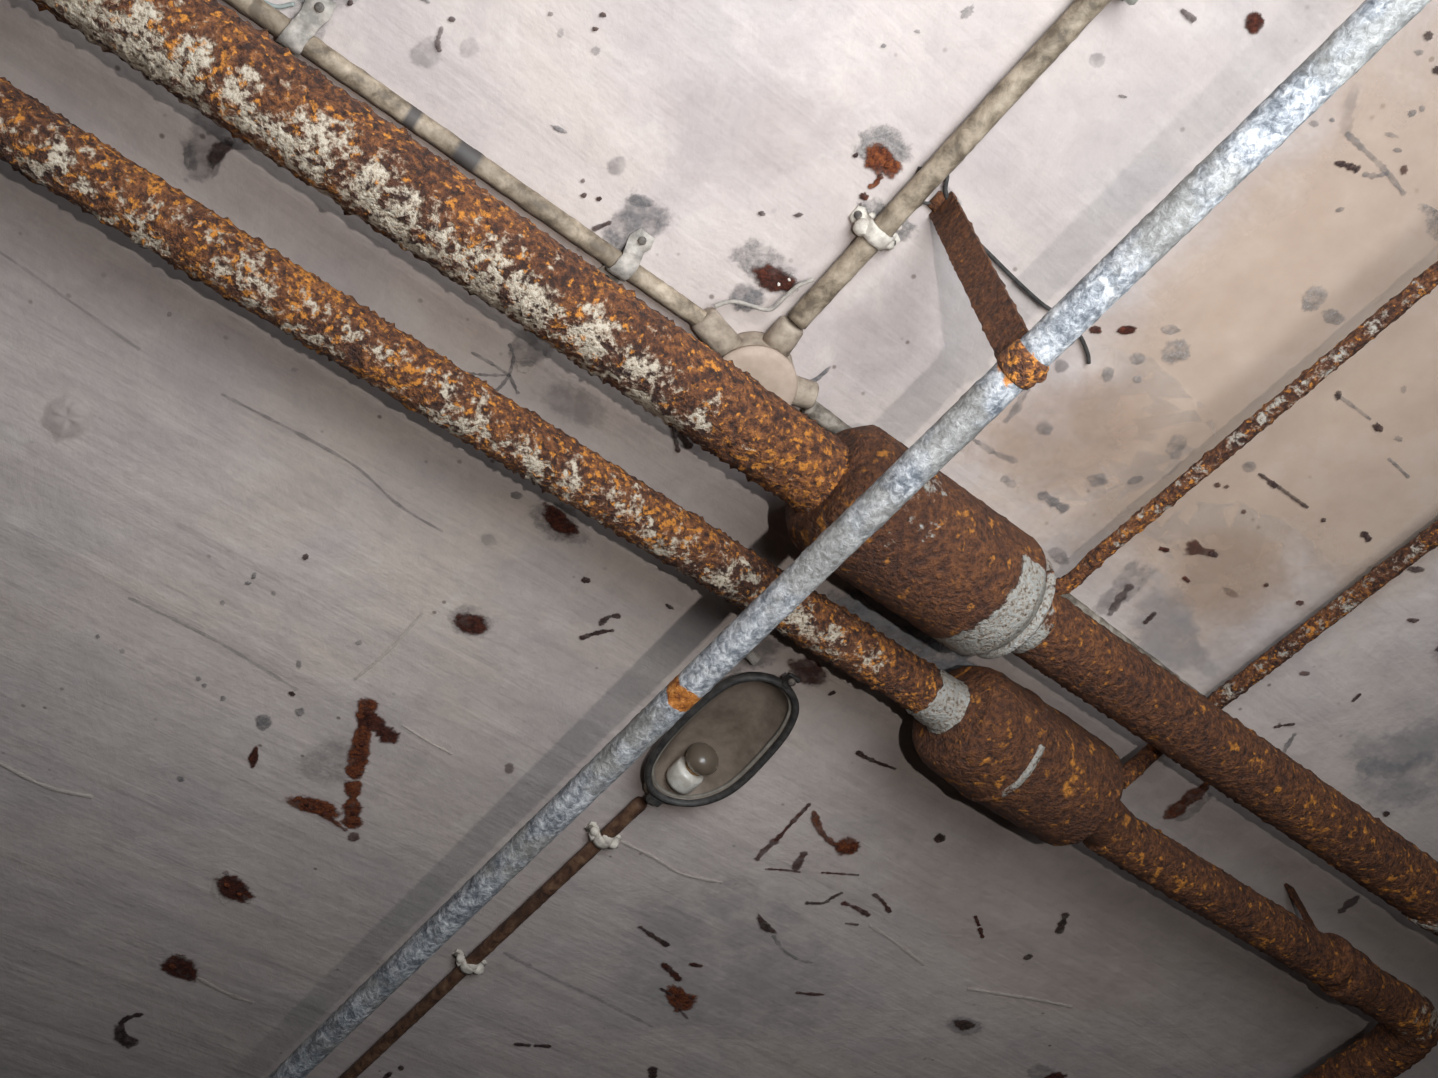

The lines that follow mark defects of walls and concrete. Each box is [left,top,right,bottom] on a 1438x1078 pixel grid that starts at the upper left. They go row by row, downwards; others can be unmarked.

corrosion [287,698,400,841]
corrosion [755,803,861,873]
corrosion [806,892,892,926]